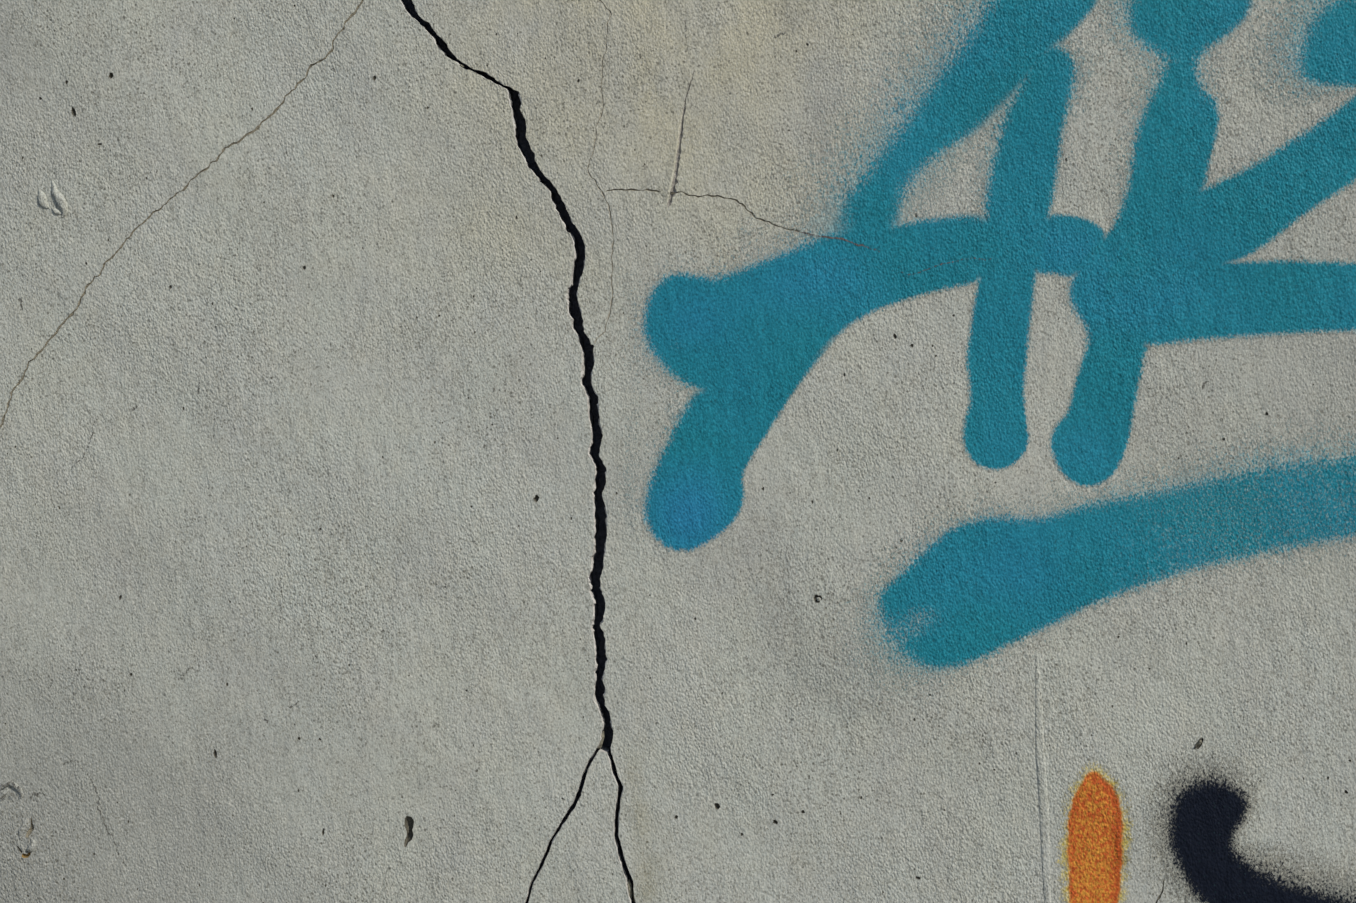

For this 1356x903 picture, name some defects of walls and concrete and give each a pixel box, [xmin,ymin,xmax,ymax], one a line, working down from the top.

crack [0,0,364,428]
crack [400,0,875,903]